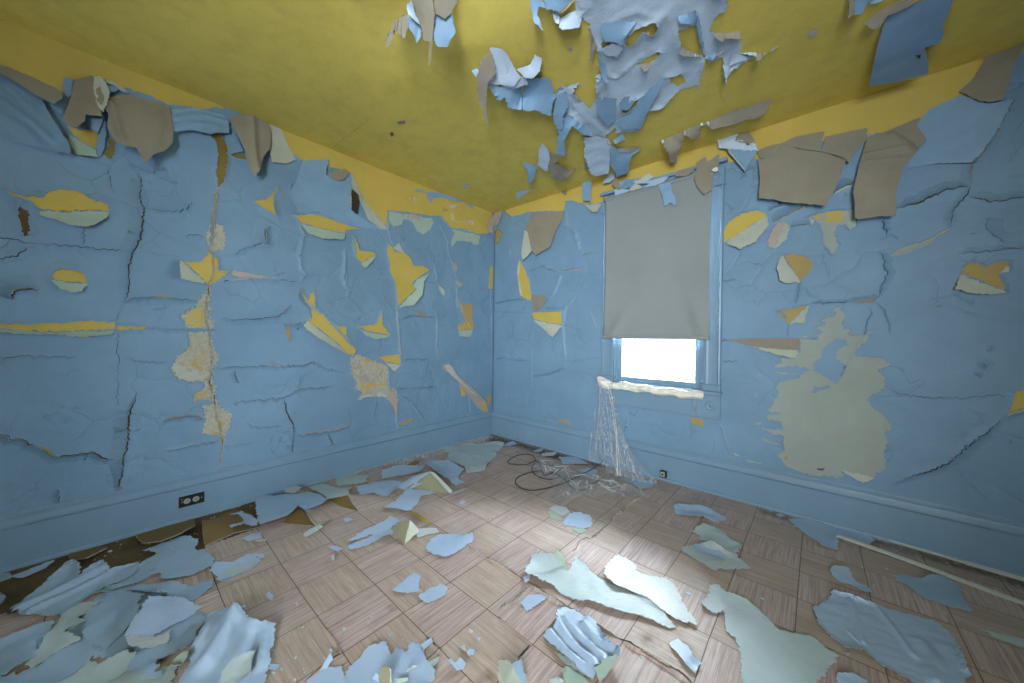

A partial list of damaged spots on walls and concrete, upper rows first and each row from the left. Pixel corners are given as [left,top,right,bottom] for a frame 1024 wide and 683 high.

flaking render [0,19,240,115]
peeling [282,0,984,247]
crack [0,137,350,504]
flaking render [348,353,400,431]
flaking render [457,298,476,337]
flaking render [754,306,893,483]
crack [793,178,1024,381]
crack [886,387,1012,502]